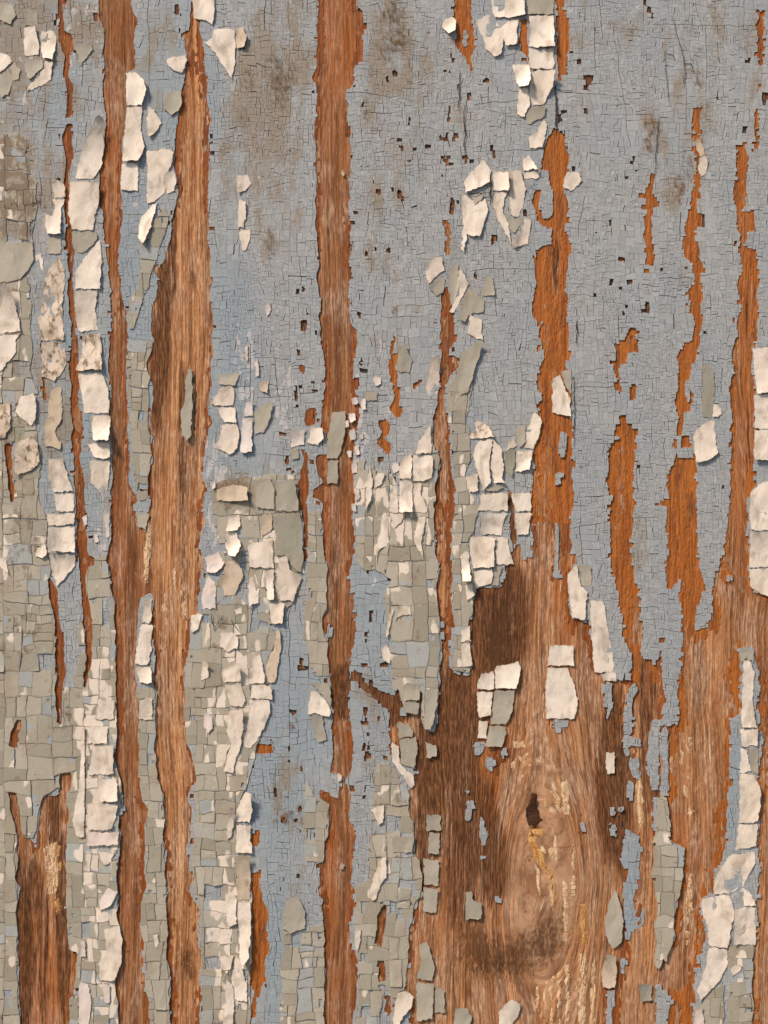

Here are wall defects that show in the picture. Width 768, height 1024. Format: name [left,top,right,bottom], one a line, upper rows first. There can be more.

peeling [146,106,161,136]
crack [458,74,467,158]
peeling [442,0,572,124]
peeling [529,120,547,149]
crack [555,84,573,135]
crack [655,22,693,169]
crack [464,174,492,205]
peeling [74,240,103,289]
peeling [610,325,639,405]
crack [193,359,203,459]
peeling [90,460,111,495]
crack [449,939,457,1020]